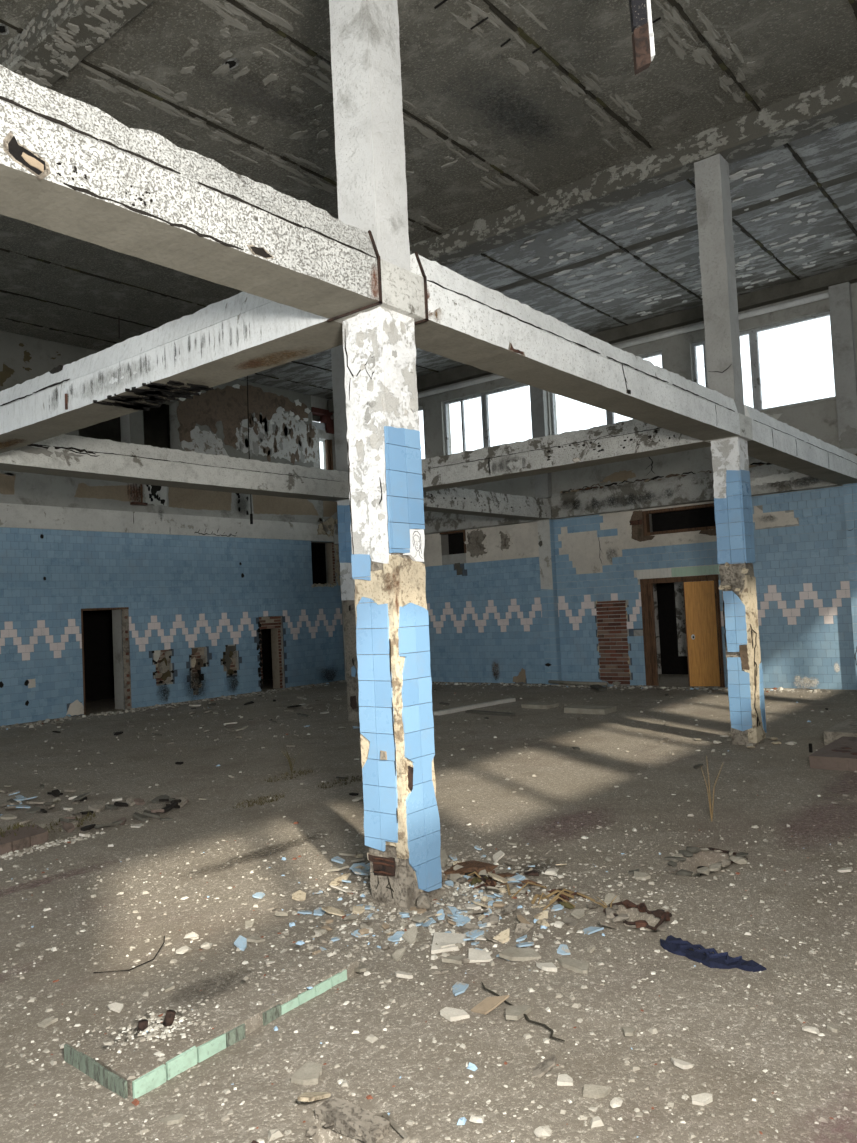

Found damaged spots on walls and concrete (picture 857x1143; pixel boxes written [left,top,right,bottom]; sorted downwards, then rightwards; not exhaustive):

peeling [0,0,337,194]
peeling [434,0,661,178]
crack [0,96,376,258]
peeling [733,180,852,289]
flaking render [177,384,321,464]
flaking render [349,331,417,480]
peeling [455,510,664,589]
spalling [739,630,753,671]
spalling [349,694,358,711]
spalling [360,733,387,767]
spalling [406,763,414,793]
spalling [367,852,399,878]